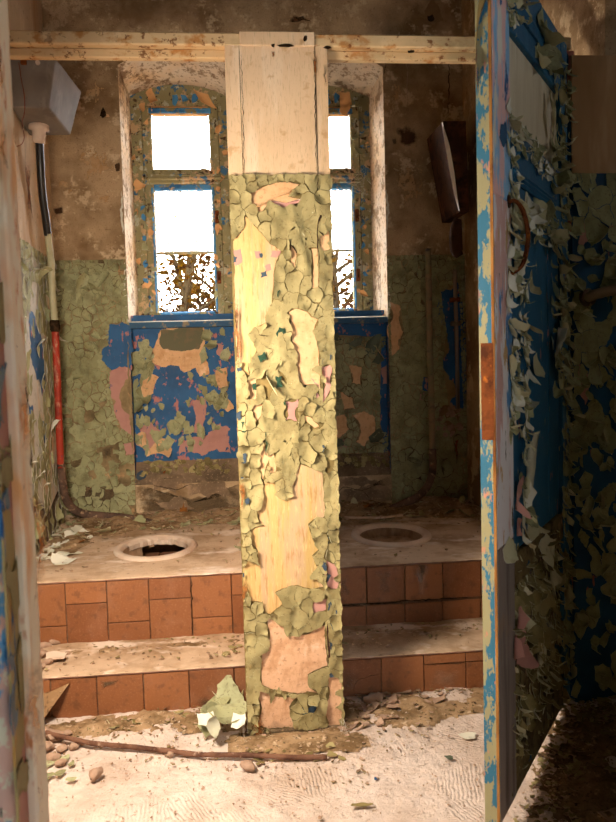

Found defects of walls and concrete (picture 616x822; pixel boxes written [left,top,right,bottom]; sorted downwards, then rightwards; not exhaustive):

peeling [172,89,216,108]
water stain [398,127,416,145]
peeling [132,148,157,295]
peeling [251,182,300,212]
peeling [312,231,330,288]
peeling [20,217,319,565]
peeling [276,254,468,504]
peeling [499,0,616,769]
peeling [5,556,20,619]
peeling [243,432,424,731]
peeling [7,632,25,736]
peeling [16,757,29,800]